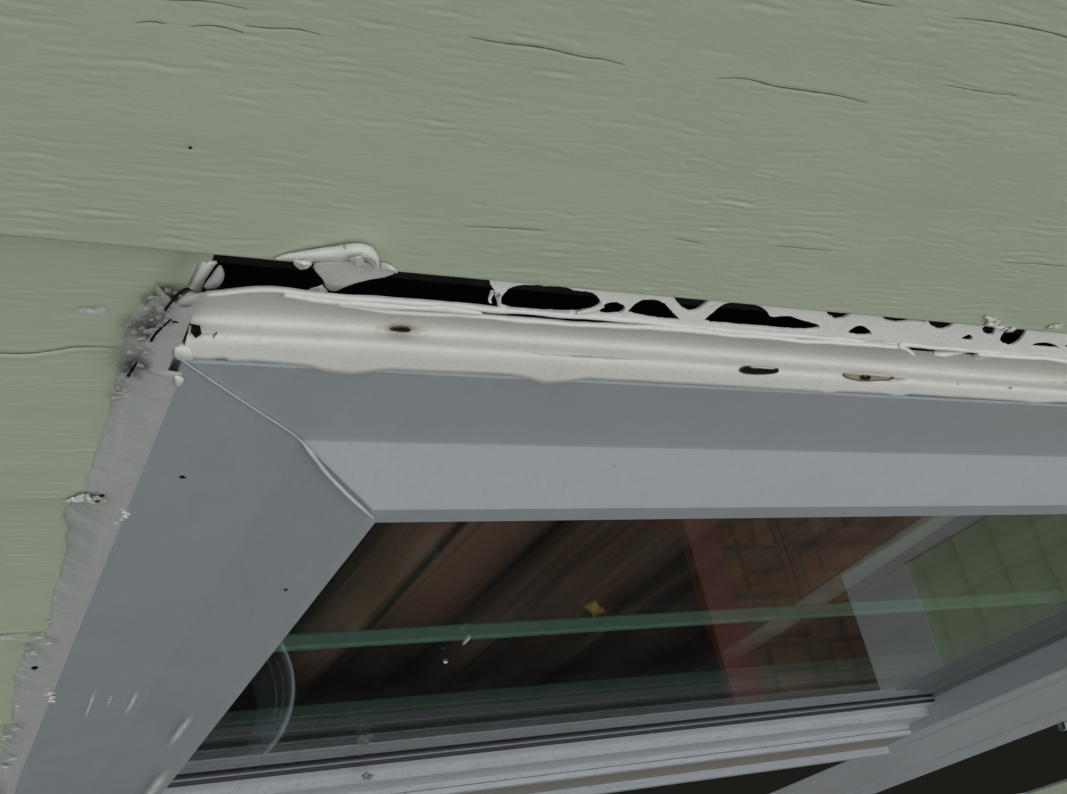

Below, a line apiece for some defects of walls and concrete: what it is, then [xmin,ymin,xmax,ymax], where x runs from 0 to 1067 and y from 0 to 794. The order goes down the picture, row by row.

peeling [293,260,312,270]
peeling [350,254,397,275]
peeling [176,260,225,307]
peeling [985,316,1016,333]